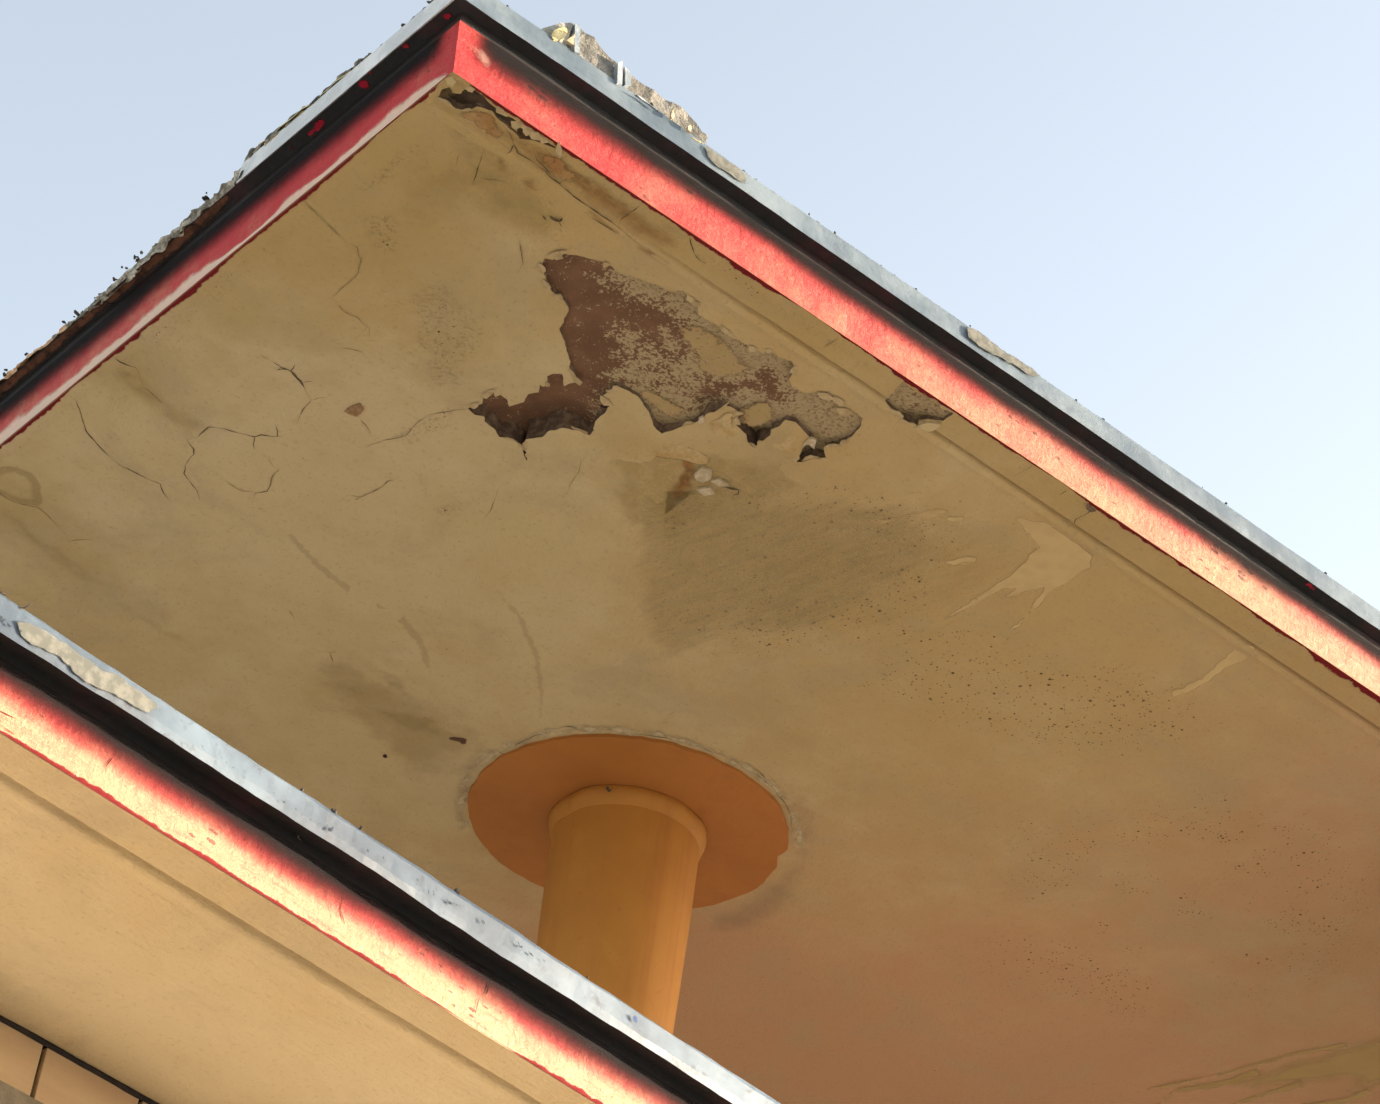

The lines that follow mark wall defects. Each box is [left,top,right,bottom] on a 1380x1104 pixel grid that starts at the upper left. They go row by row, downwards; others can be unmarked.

spalling [437,76,562,158]
spalling [468,249,862,463]
crack [67,356,324,505]
spalling [885,382,953,432]
peeling [694,466,729,496]